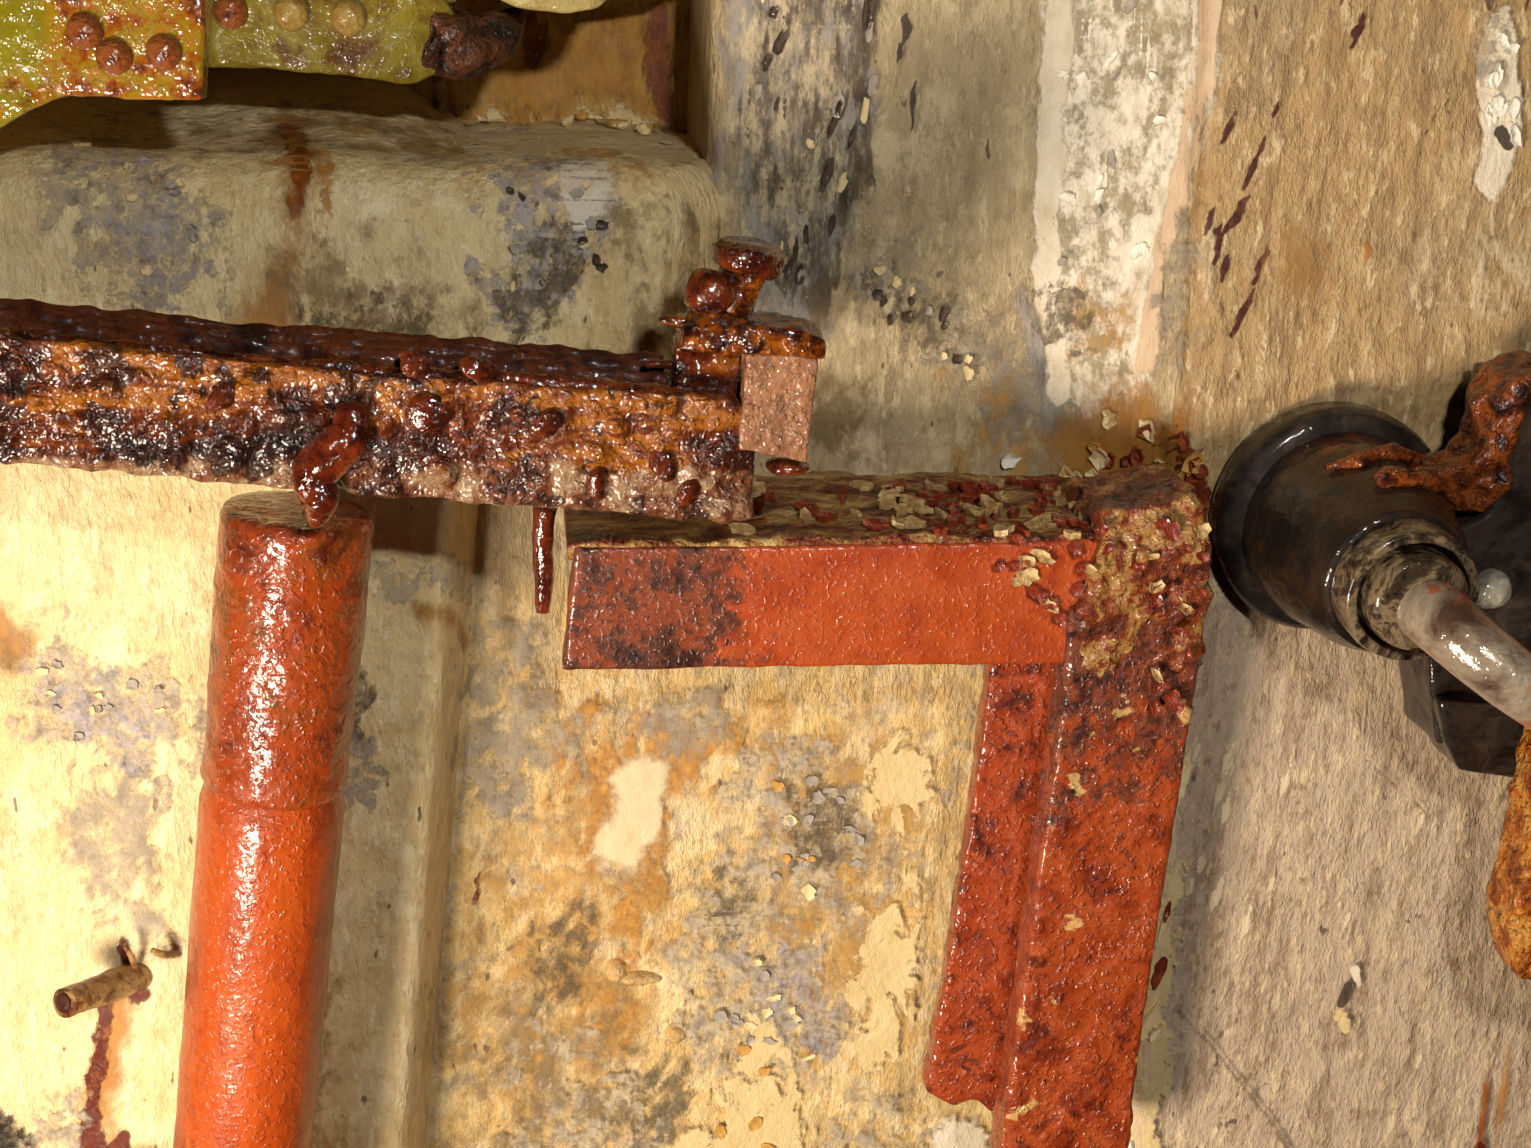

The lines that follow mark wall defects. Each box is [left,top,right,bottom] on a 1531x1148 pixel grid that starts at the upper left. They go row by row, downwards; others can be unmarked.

spalling [1471,0,1529,201]
rust [242,109,334,326]
rust [0,612,25,665]
rust [863,396,1212,627]
peeling [1148,579,1165,593]
peeling [1151,667,1164,684]
leakage [0,1088,97,1148]
rust [77,989,150,1148]
rust [116,937,130,964]
leakage [477,900,626,1136]
peeling [487,688,989,1148]
peeling [1128,739,1191,1148]